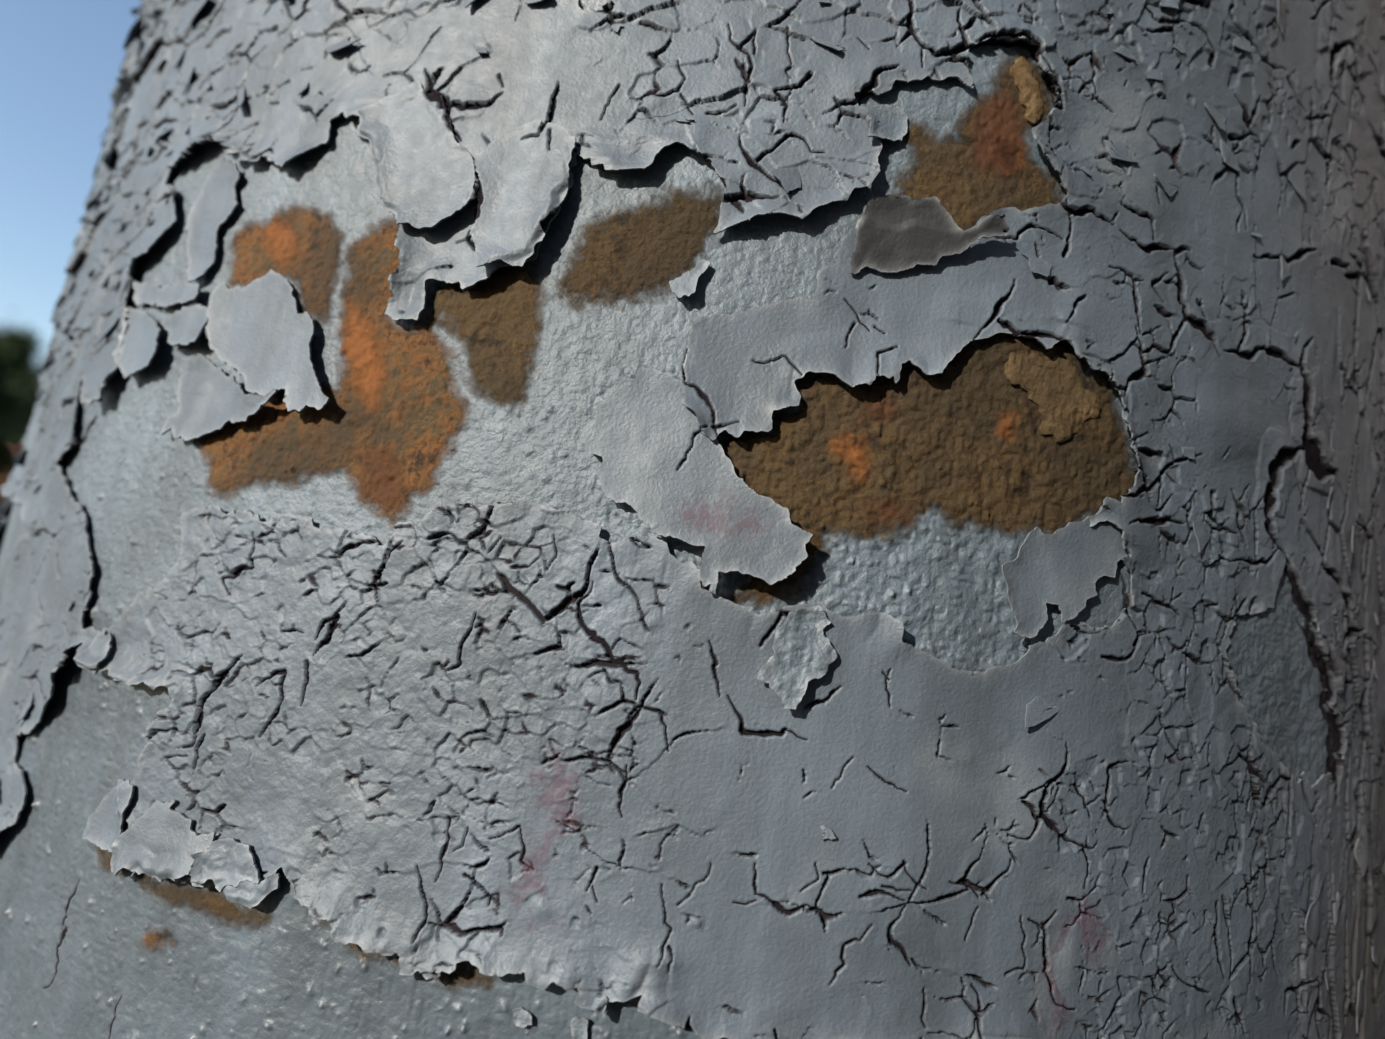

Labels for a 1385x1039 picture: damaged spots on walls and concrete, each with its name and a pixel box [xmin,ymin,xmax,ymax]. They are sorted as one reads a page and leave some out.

peeling [119,4,151,74]
crack [424,69,504,141]
peeling [579,0,618,12]
crack [601,0,1111,193]
rust [894,51,1061,231]
rust [198,181,724,524]
peeling [0,40,1142,1039]
rust [721,333,1135,605]
crack [167,615,340,767]
crack [577,584,669,751]
peeling [1198,557,1342,794]
crack [831,744,1127,1039]